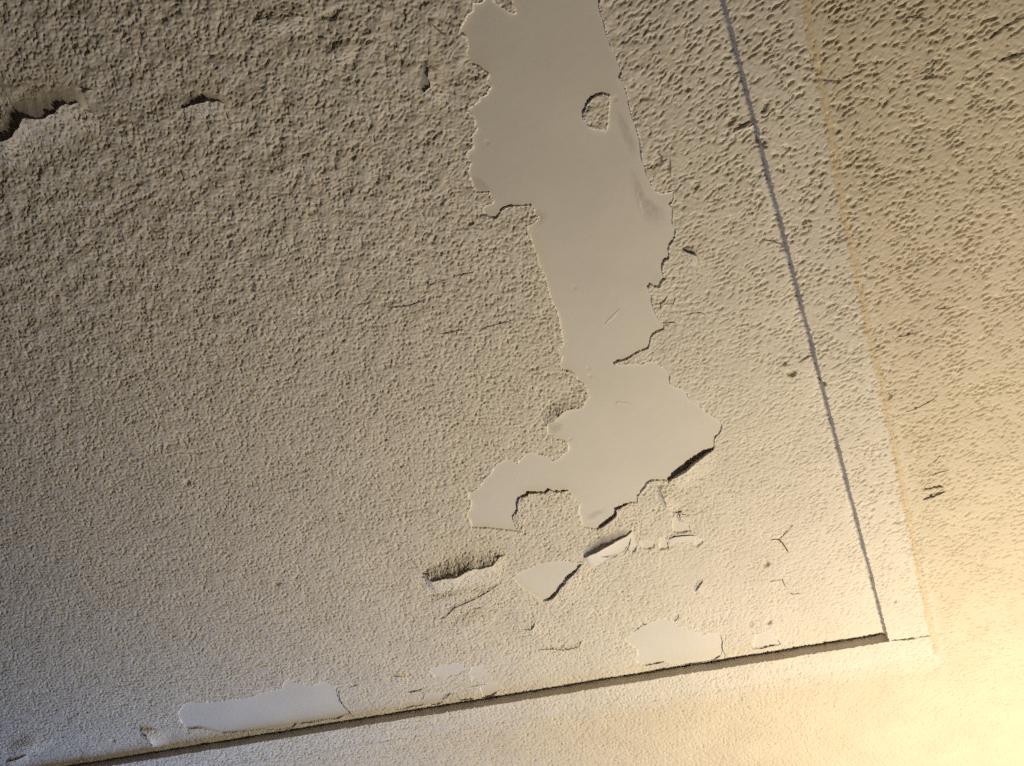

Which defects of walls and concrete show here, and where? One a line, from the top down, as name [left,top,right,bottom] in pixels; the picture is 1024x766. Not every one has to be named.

peeling [0,81,101,170]
peeling [182,90,235,125]
peeling [423,0,724,638]
peeling [624,618,723,666]
peeling [177,678,351,734]